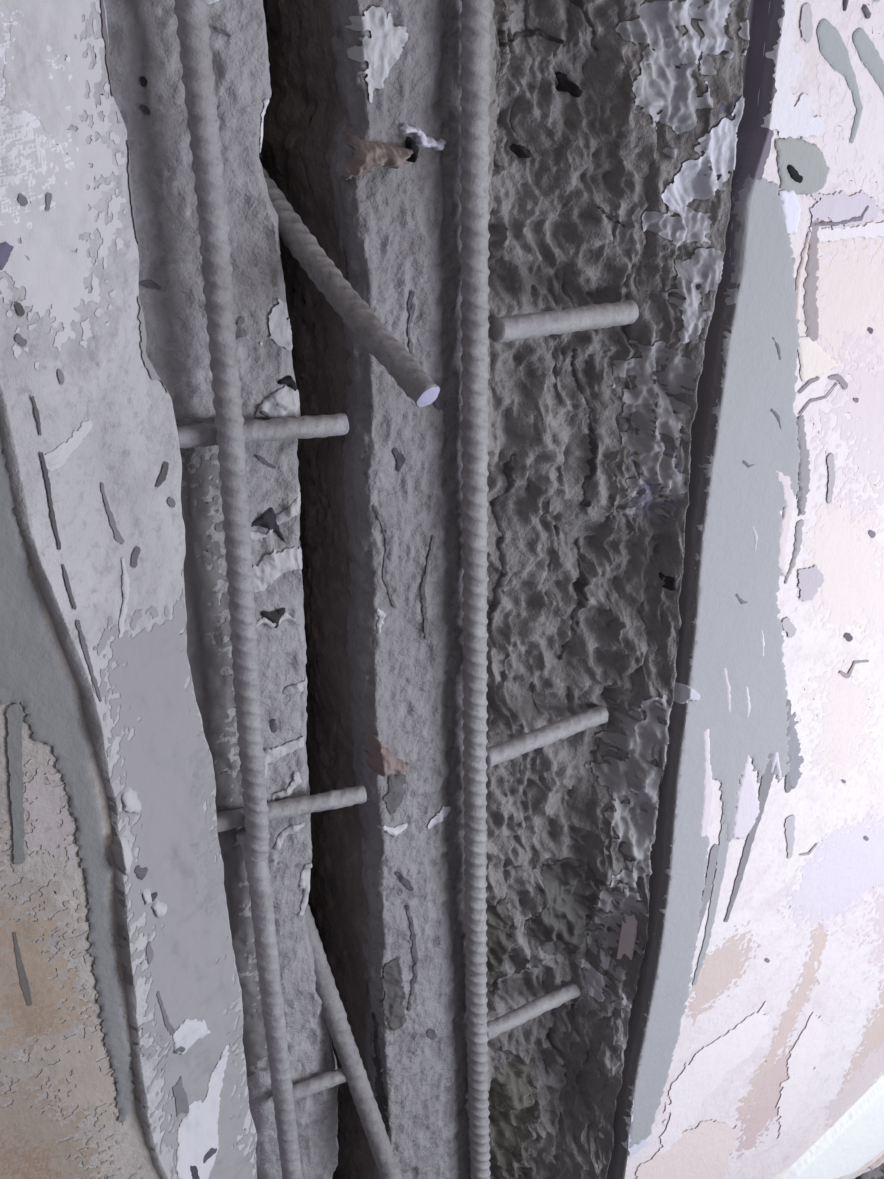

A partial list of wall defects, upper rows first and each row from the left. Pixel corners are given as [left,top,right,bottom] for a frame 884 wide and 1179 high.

spalling [345,6,408,103]
spalling [260,99,269,152]
spalling [400,124,446,162]
hole [0,241,14,270]
spalling [612,0,750,520]
spalling [260,299,293,350]
spalling [255,375,301,419]
spalling [250,487,302,592]
spalling [575,695,672,1017]
spalling [298,863,312,916]
peeling [173,1019,211,1055]
peeling [176,1045,230,1179]